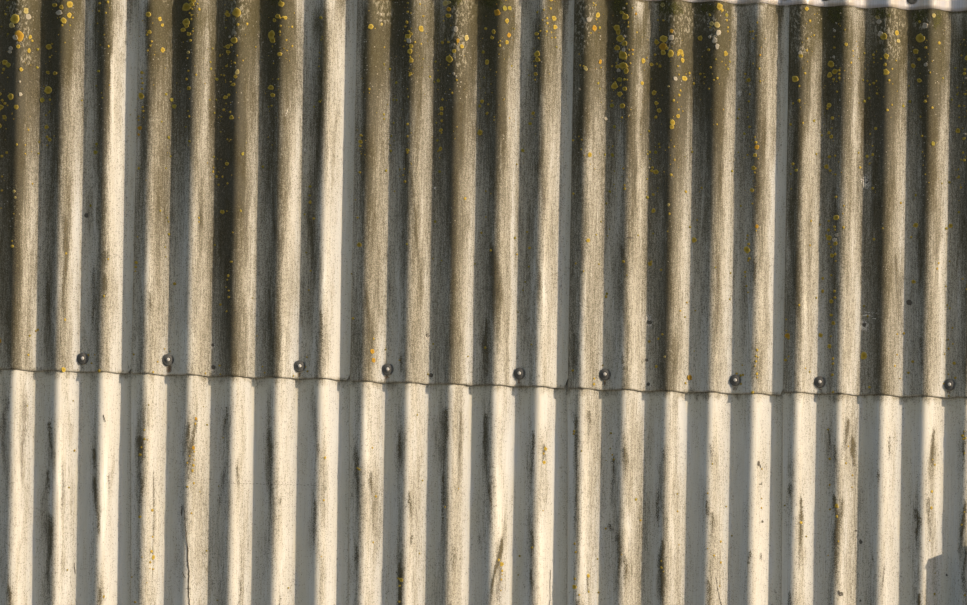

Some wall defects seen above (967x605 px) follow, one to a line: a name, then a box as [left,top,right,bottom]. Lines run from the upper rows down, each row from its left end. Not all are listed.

damp [44,217,69,359]
damp [482,244,500,376]
damp [45,514,53,581]
damp [91,449,111,533]
damp [135,436,155,592]
crack [181,506,190,605]
damp [441,408,462,533]
damp [490,537,504,605]
damp [572,411,591,529]
damp [655,488,676,605]
damp [787,483,804,569]
damp [832,494,843,575]